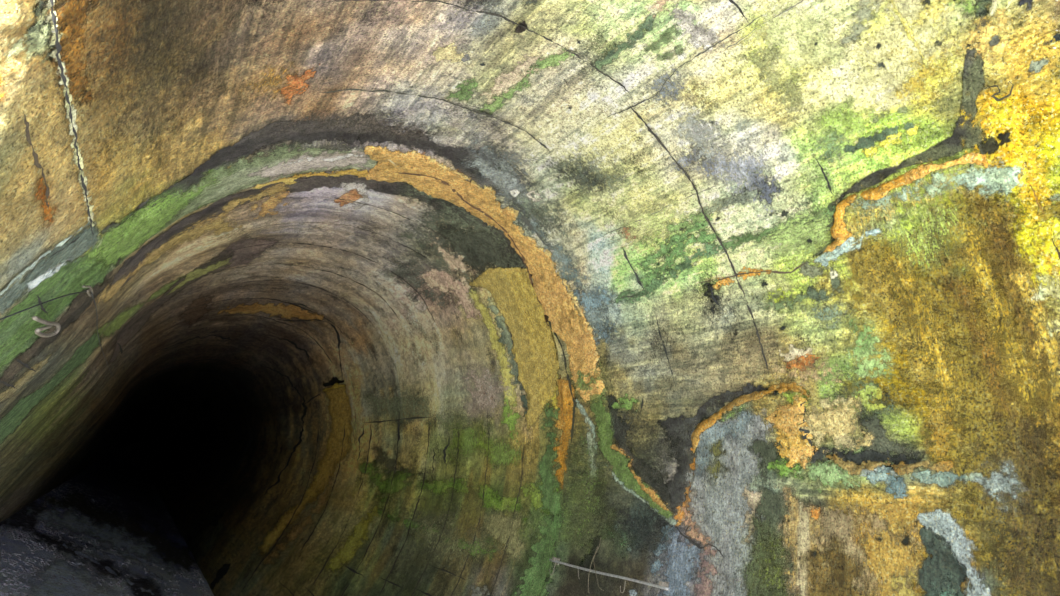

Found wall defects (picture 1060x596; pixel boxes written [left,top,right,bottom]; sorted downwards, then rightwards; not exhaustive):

crack [23,0,103,247]
damp [3,0,280,171]
crack [321,0,804,383]
crack [815,158,833,194]
crack [890,0,929,68]
damp [813,0,1060,596]
spalling [799,395,954,475]